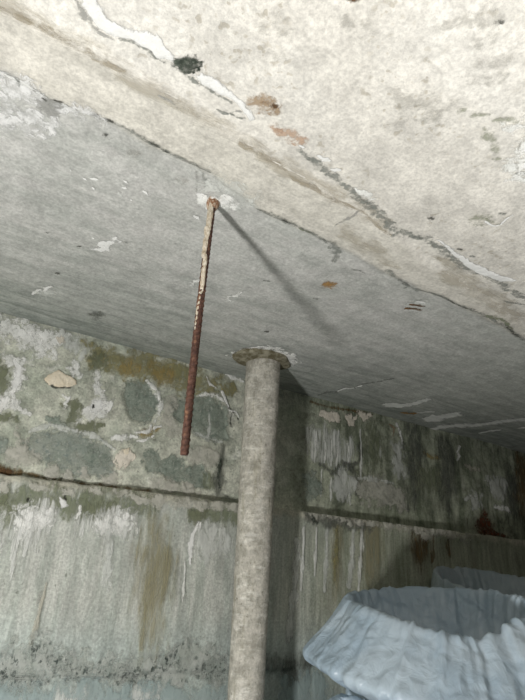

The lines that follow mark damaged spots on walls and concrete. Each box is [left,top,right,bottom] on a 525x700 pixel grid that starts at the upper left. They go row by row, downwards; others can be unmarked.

leakage [11,9,55,36]
leakage [75,0,255,121]
rust [248,94,280,116]
rust [270,126,307,146]
crack [258,209,342,262]
crack [300,150,525,340]
flaking render [22,193,238,513]
peeling [310,401,373,426]
leakage [75,505,171,648]
leakage [310,513,472,593]